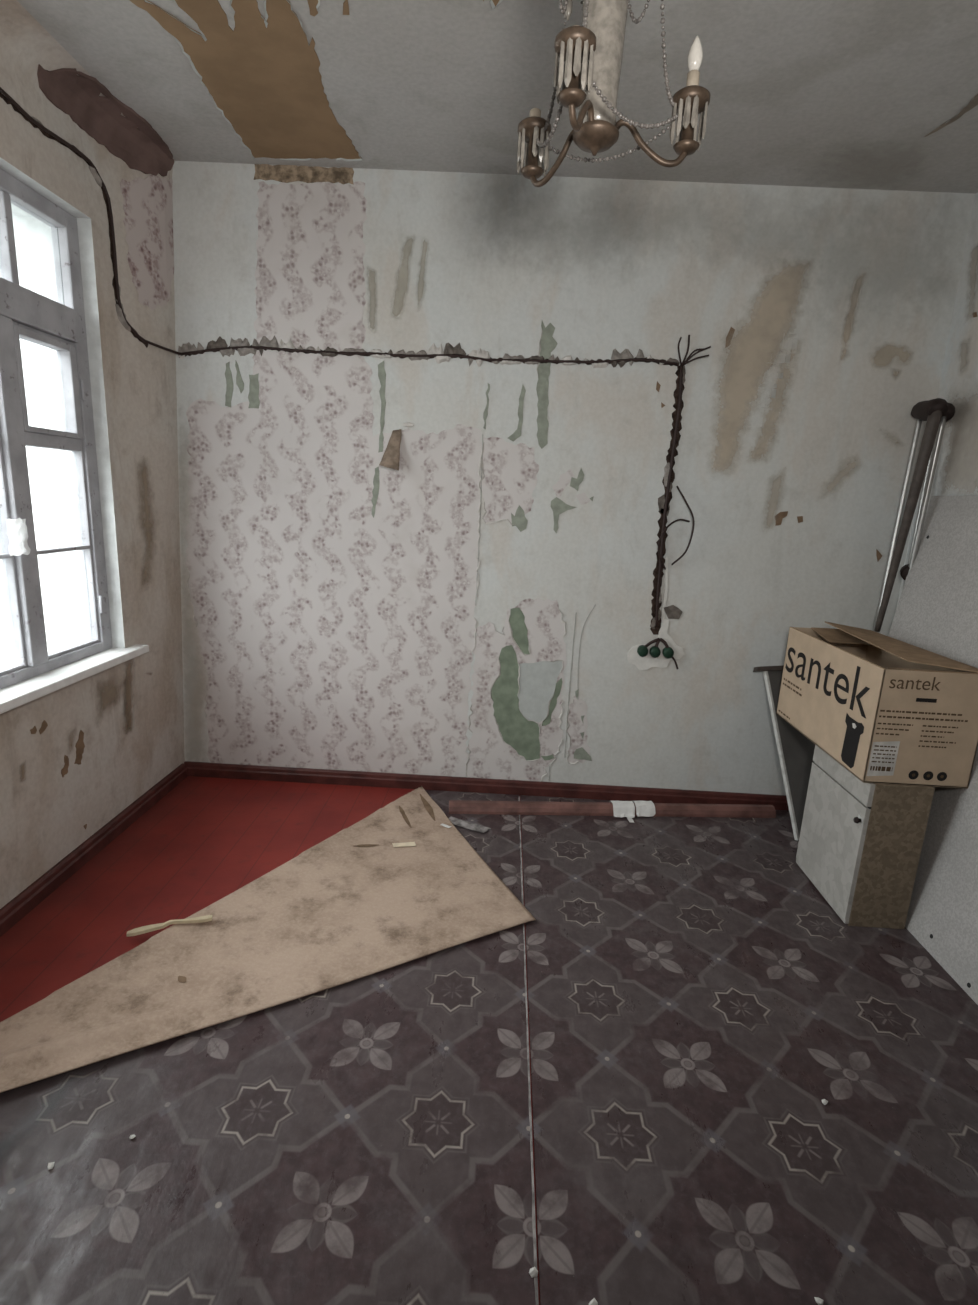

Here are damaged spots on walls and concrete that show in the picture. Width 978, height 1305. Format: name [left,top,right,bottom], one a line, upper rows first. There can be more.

peeling [130,0,362,162]
spalling [725,327,735,348]
crack [475,434,483,606]
spalling [775,511,803,526]
flaking render [509,607,579,726]
peeling [574,715,592,761]